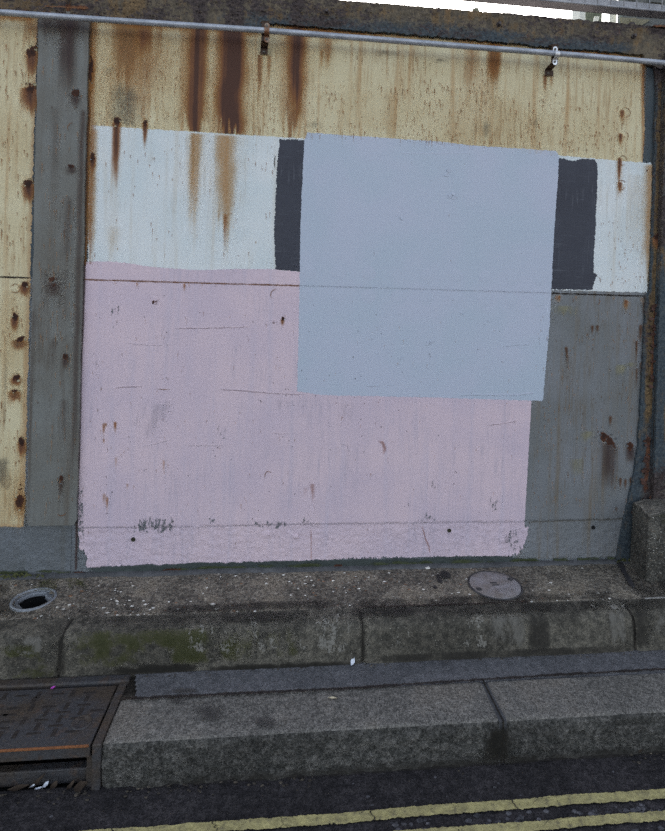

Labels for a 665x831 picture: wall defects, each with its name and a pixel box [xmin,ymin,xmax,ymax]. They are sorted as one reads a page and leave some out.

corrosion [7,16,38,115]
corrosion [43,19,79,78]
corrosion [110,24,152,82]
corrosion [264,27,359,137]
corrosion [485,43,501,85]
corrosion [107,117,125,175]
corrosion [179,28,270,231]
corrosion [23,178,34,203]
corrosion [62,22,99,431]
corrosion [9,307,27,349]
corrosion [1,373,21,407]
corrosion [595,431,651,486]